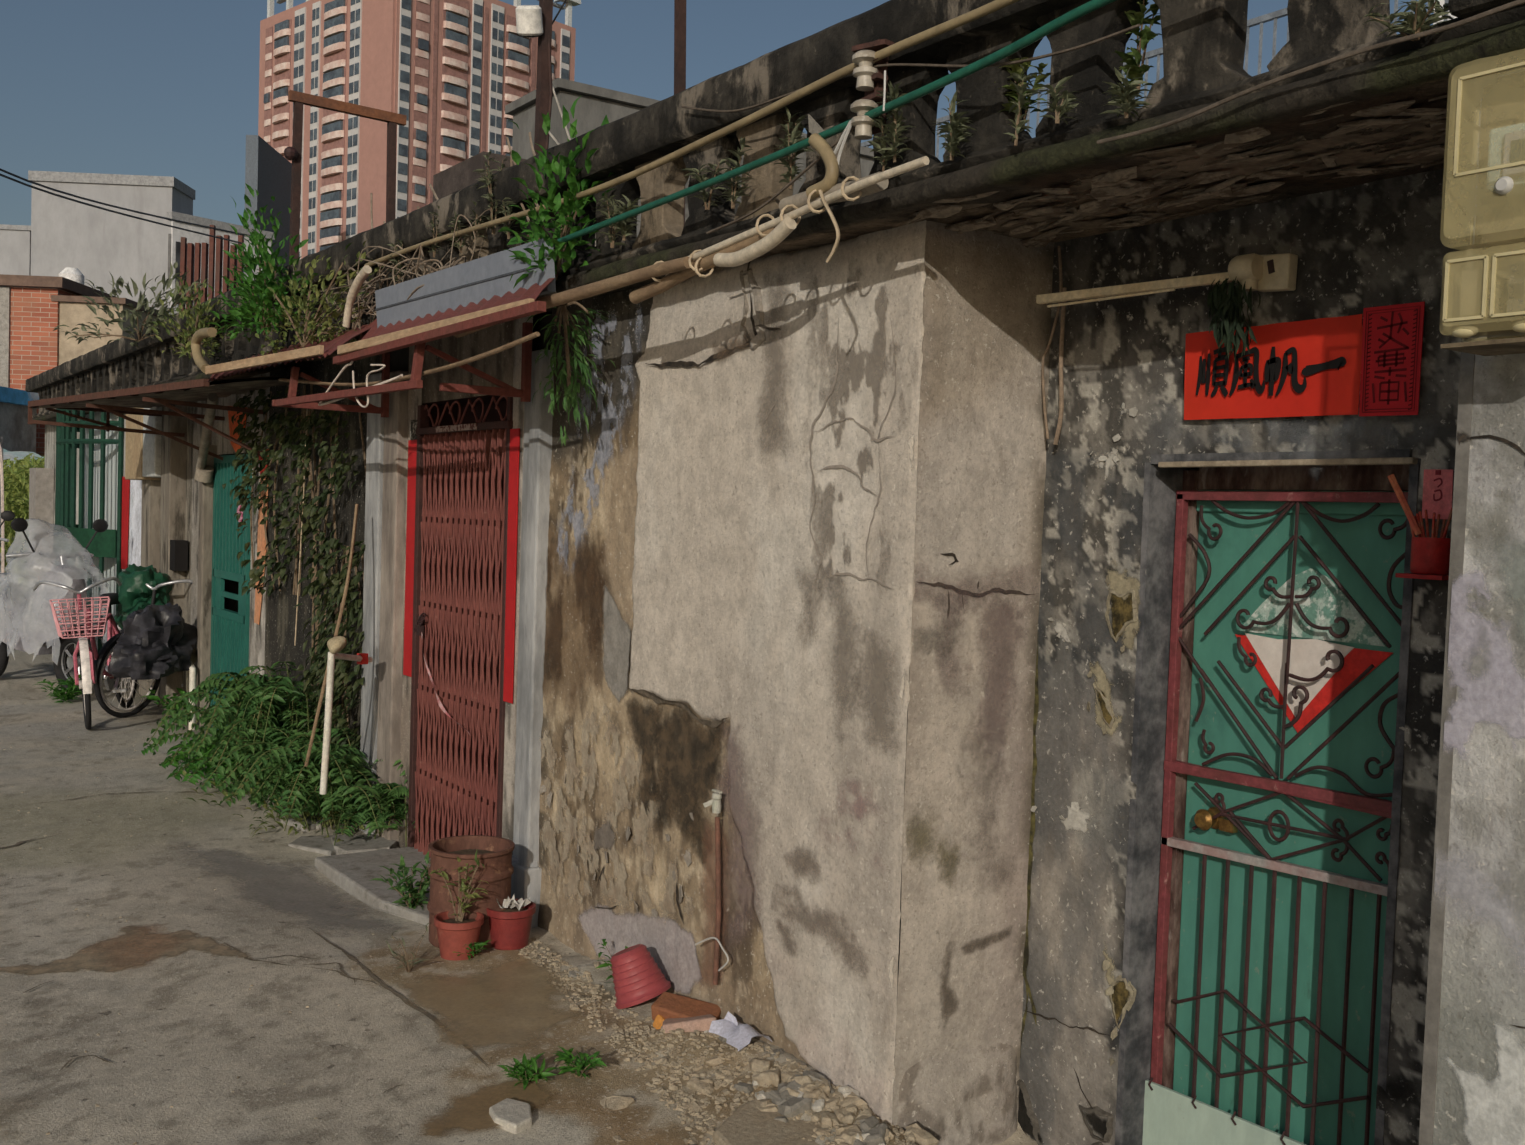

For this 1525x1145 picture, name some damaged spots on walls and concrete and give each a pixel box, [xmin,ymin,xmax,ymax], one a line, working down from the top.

peeling [904,88,1475,248]
crack [645,261,780,368]
water stain [718,280,785,447]
water stain [542,308,642,688]
water stain [803,287,896,747]
crack [918,553,1032,619]
spalling [1105,561,1140,653]
flaking render [539,706,693,918]
peeling [1031,802,1096,833]
crack [252,928,493,1073]
water stain [778,889,856,962]
spalling [1102,951,1136,1040]